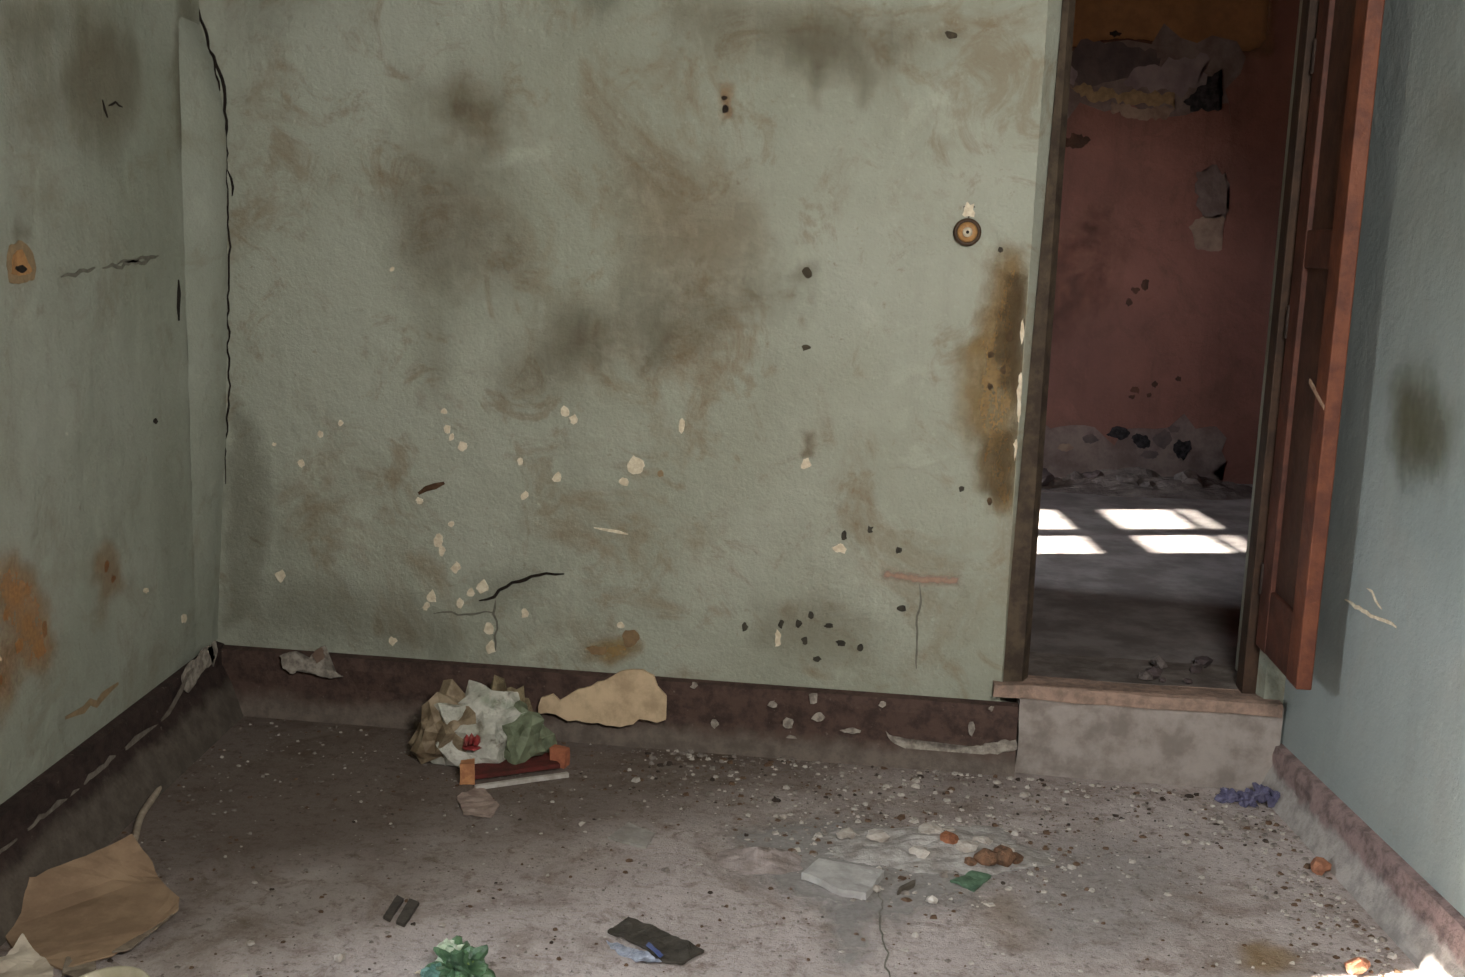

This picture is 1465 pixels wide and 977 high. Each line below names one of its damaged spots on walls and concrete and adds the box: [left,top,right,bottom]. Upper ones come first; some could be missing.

peeling [1065,24,1246,149]
crack [199,9,234,484]
peeling [1043,414,1227,481]
crack [433,572,564,651]